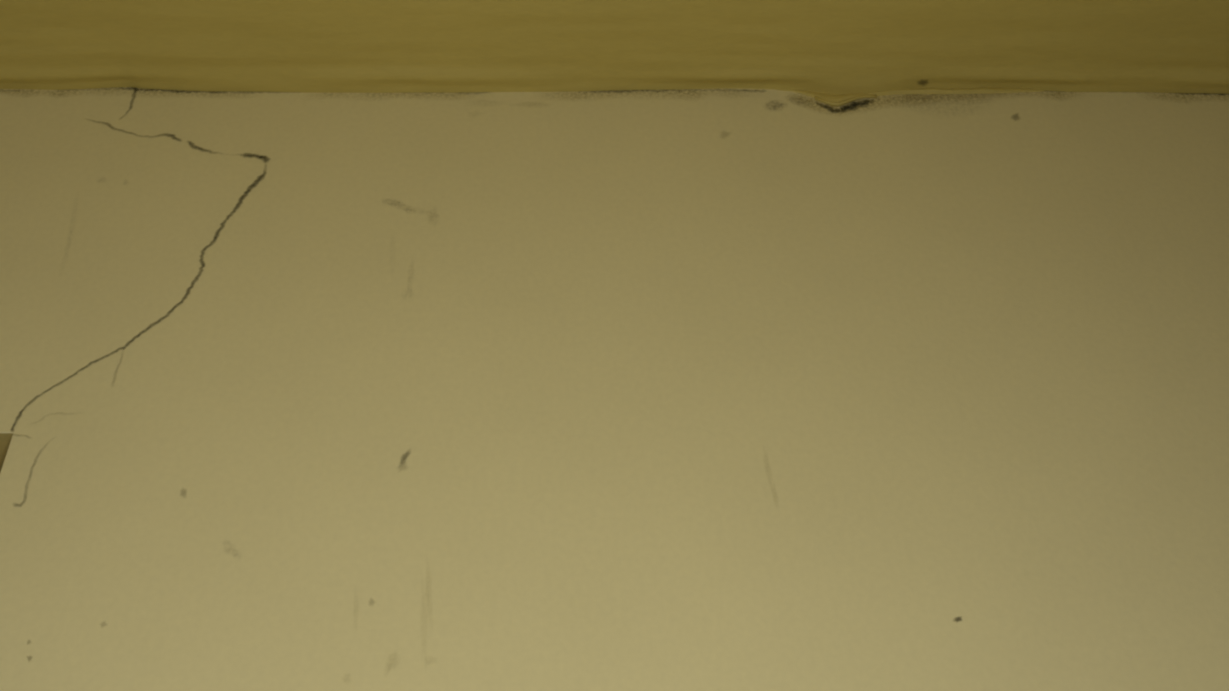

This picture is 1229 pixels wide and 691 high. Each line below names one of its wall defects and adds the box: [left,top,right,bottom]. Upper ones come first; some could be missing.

crack [74,155,268,375]